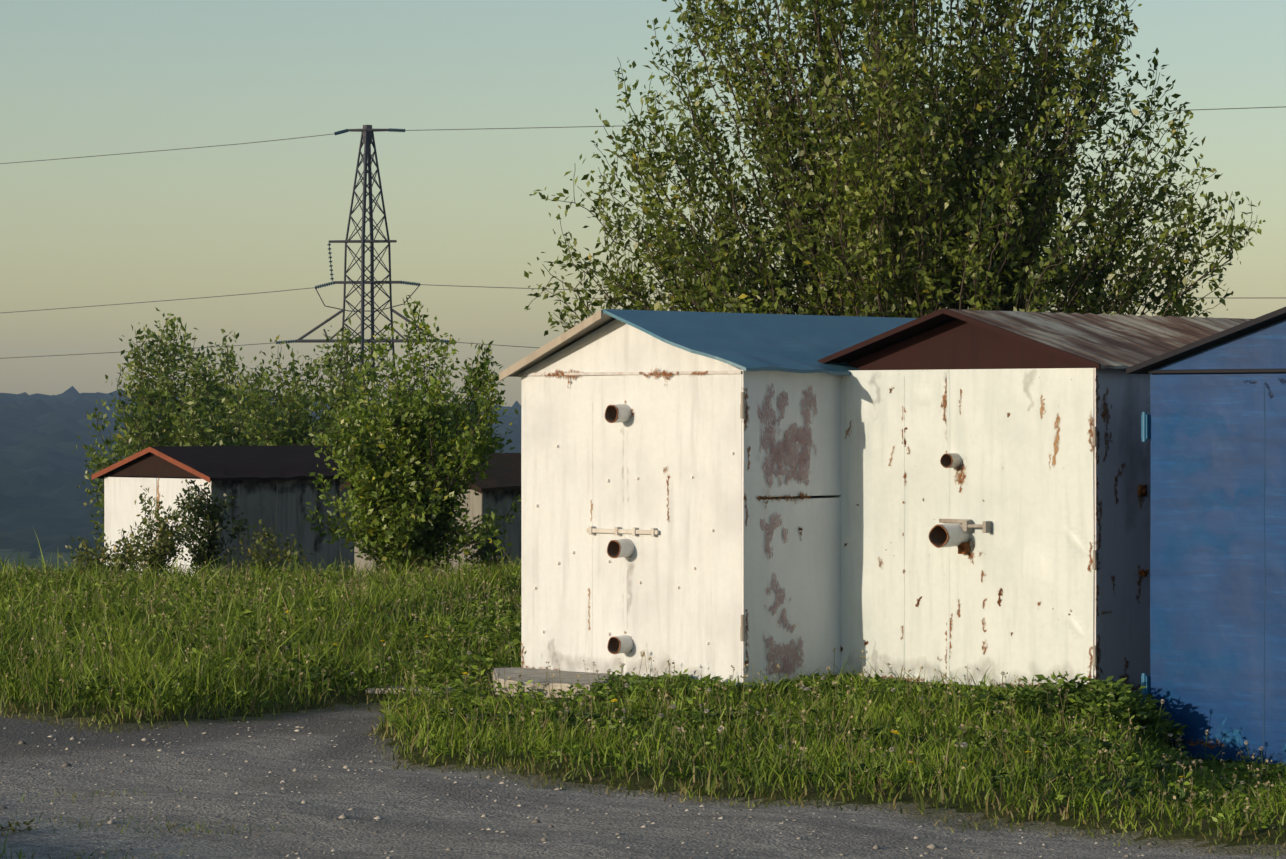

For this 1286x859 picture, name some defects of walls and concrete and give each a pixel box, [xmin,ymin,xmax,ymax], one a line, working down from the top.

rust [545,369,583,384]
rust [639,369,708,385]
peeling [758,386,817,487]
rust [955,463,966,492]
rust [1087,375,1115,616]
peeling [760,513,788,559]
peeling [763,574,804,678]
rust [1088,636,1104,683]